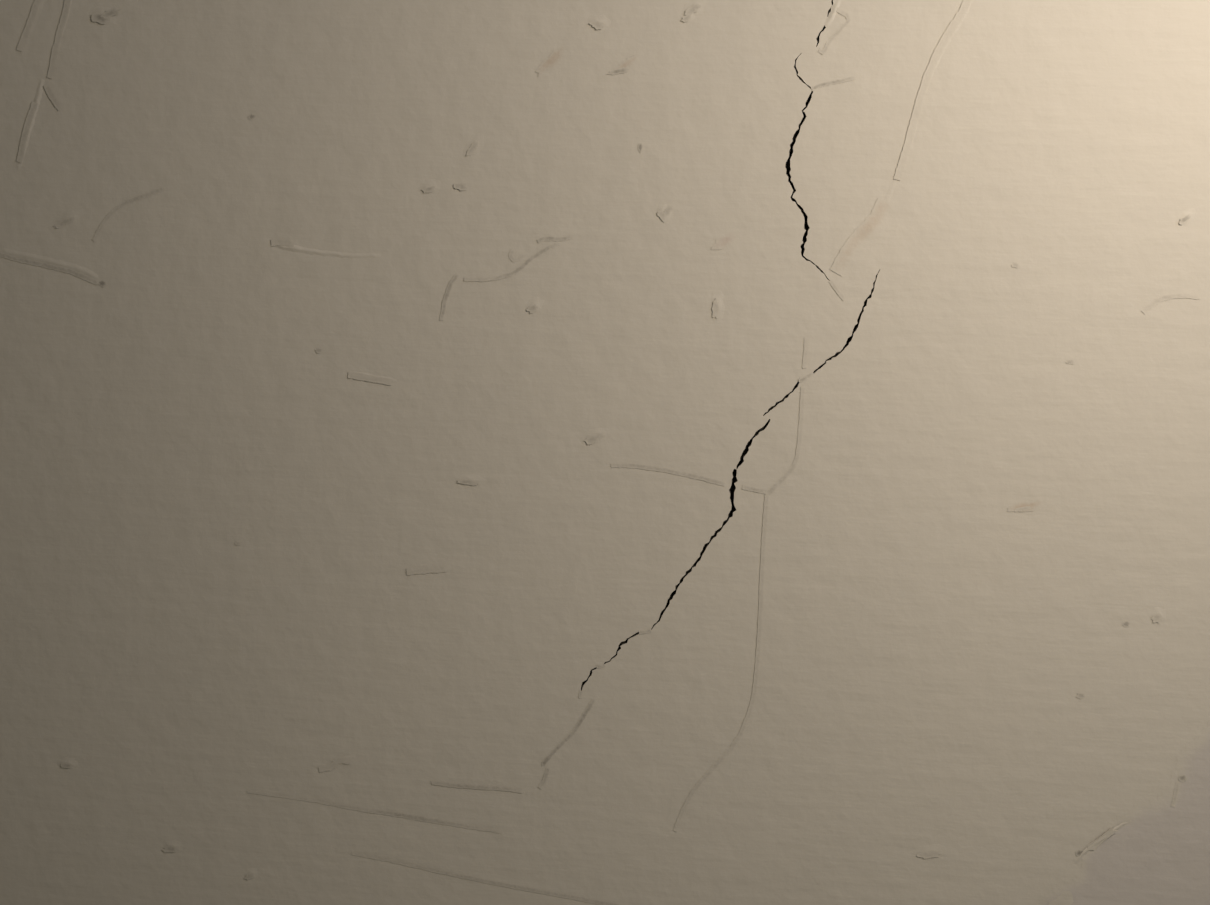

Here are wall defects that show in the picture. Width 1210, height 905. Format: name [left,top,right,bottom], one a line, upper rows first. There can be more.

crack [247,789,501,834]
crack [431,0,880,832]